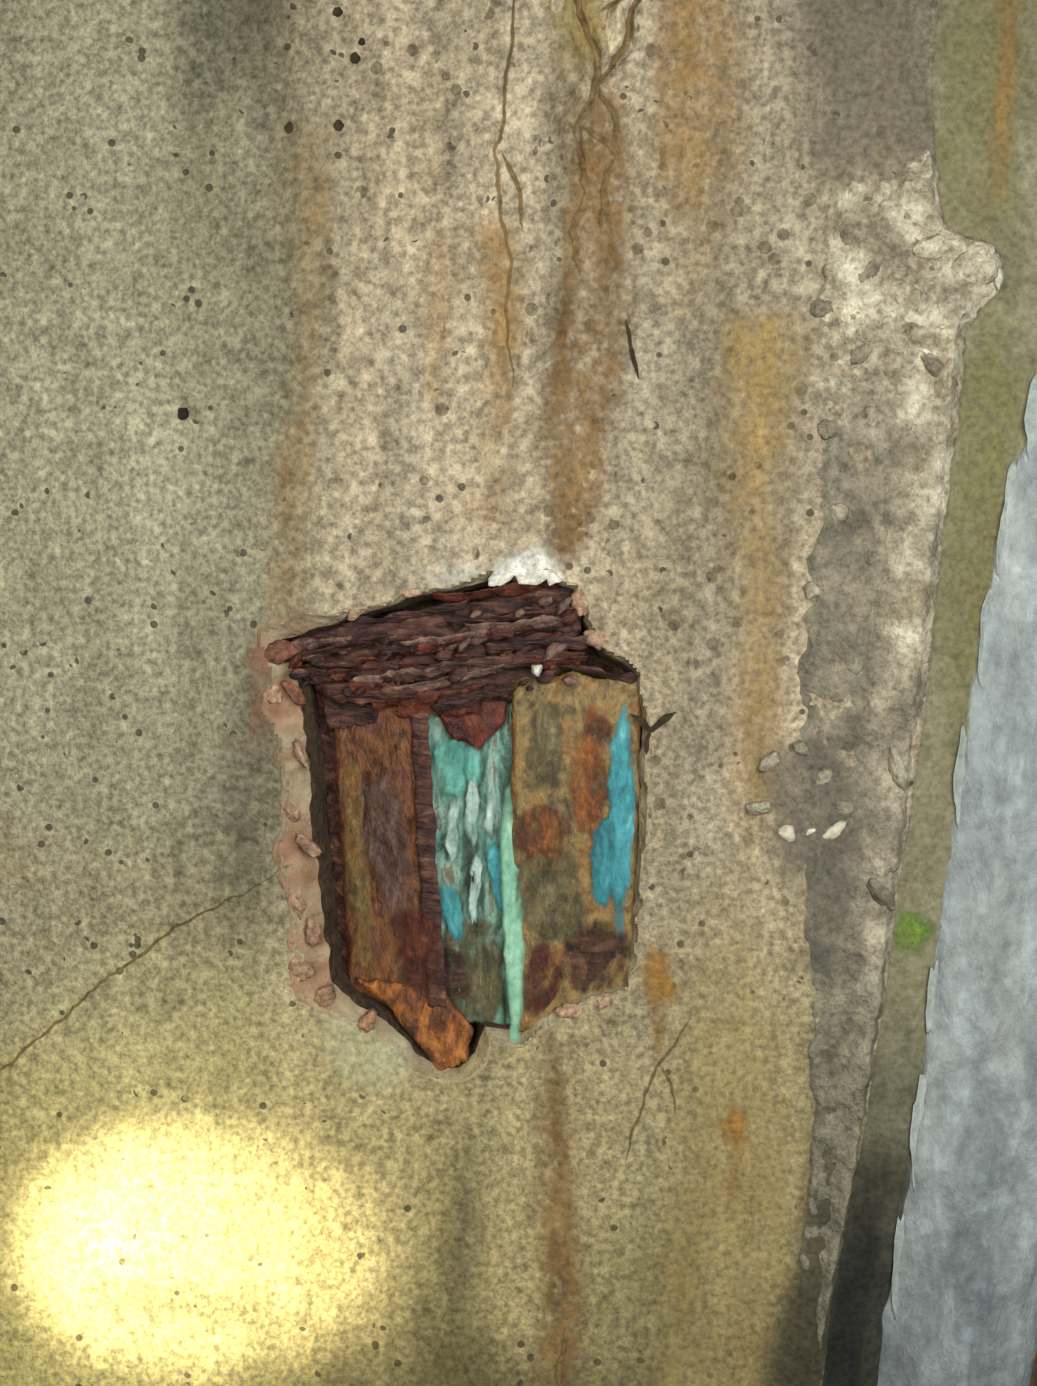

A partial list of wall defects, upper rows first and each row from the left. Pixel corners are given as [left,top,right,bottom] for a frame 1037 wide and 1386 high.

crack [493,0,523,389]
rust [550,96,620,555]
rust [574,0,597,50]
crack [570,0,641,275]
crack [625,319,639,378]
crack [0,864,293,1072]
spalling [252,568,652,1084]
rust [288,581,676,1071]